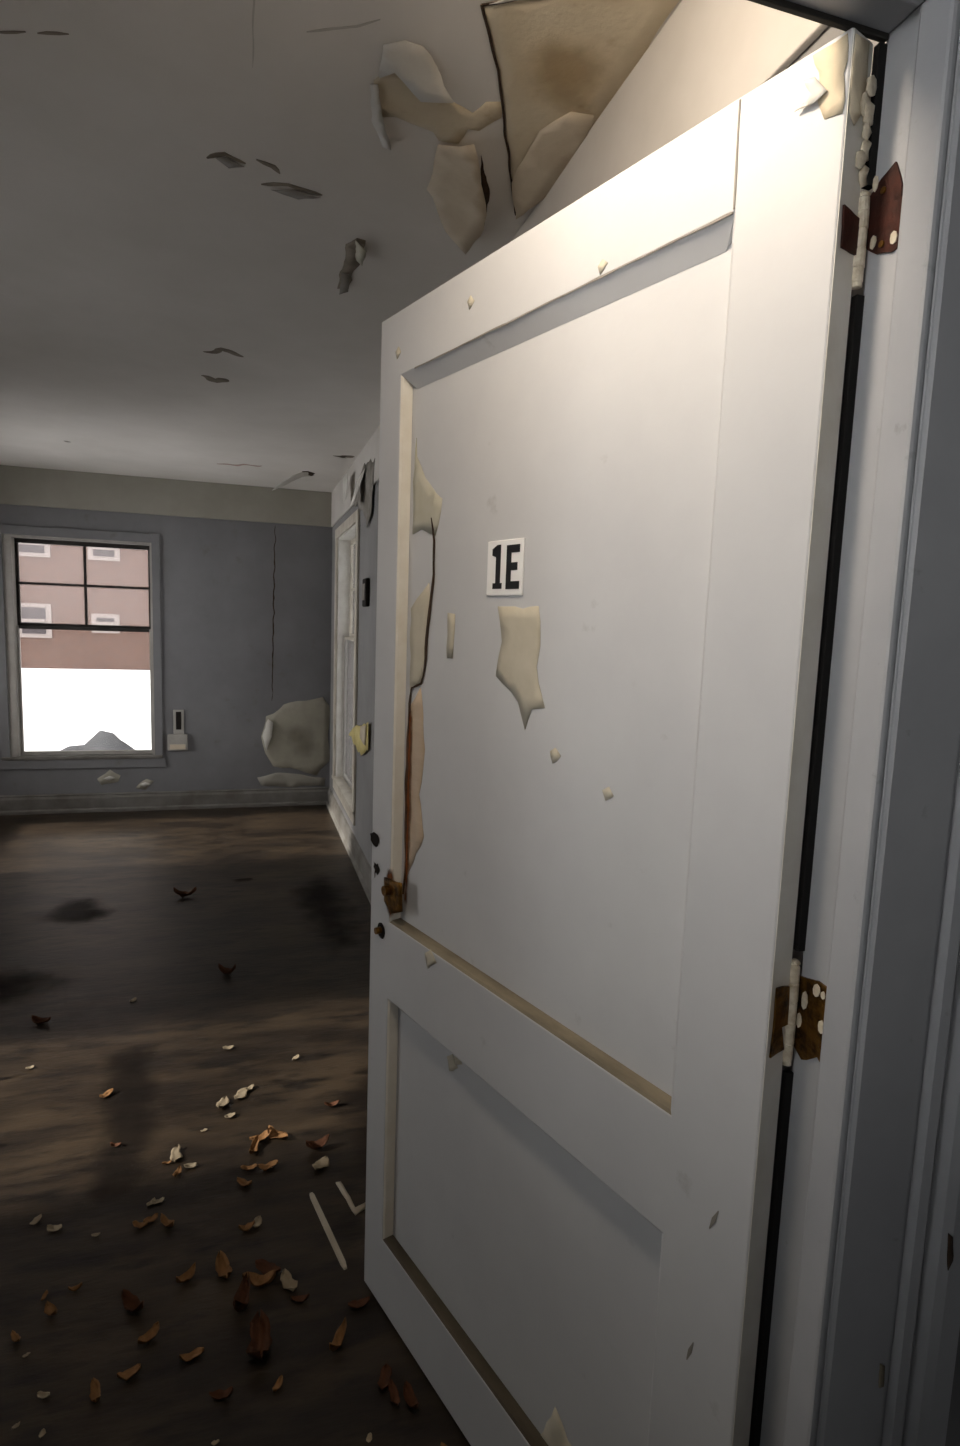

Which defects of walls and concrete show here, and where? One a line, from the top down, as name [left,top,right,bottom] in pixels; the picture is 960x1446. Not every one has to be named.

peeling [370,0,680,254]
peeling [794,33,879,192]
peeling [337,238,367,295]
peeling [413,438,442,536]
peeling [258,697,330,787]
peeling [349,722,369,756]
peeling [408,583,430,872]
peeling [496,606,545,729]